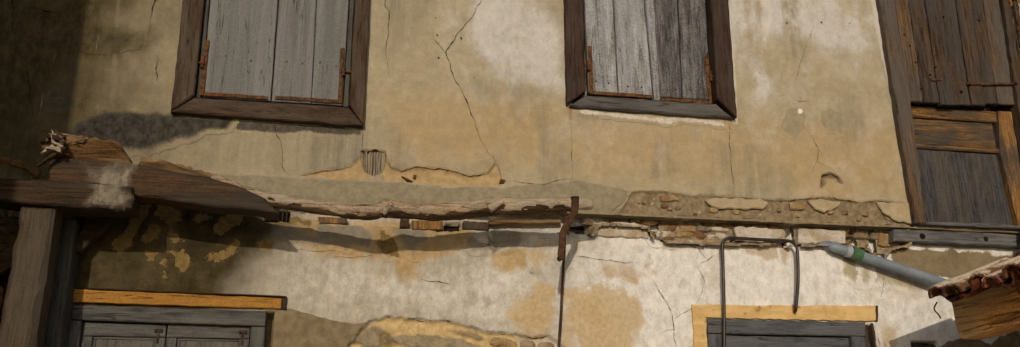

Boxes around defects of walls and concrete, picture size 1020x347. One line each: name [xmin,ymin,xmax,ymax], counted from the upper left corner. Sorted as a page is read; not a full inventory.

leakage [32,71,87,123]
leakage [54,0,144,107]
crack [387,1,573,185]
crack [275,128,363,176]
flaking render [299,149,506,189]
peeling [100,203,432,286]
peeling [347,188,917,347]
crack [569,242,710,346]